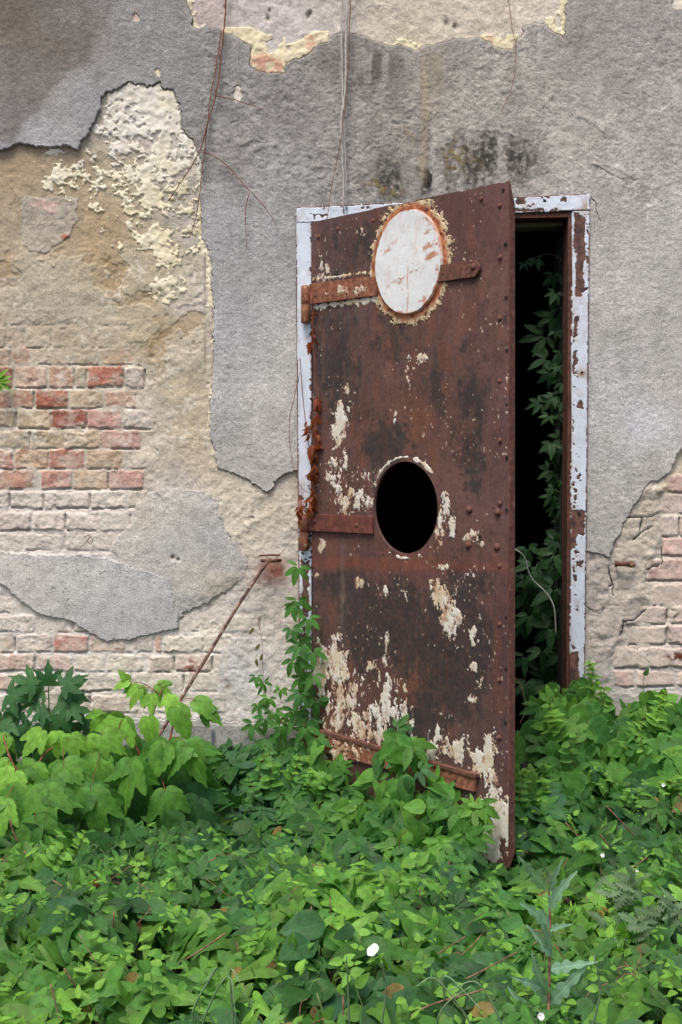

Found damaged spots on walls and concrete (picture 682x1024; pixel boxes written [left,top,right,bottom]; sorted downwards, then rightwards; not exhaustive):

flaking render [187,0,568,74]
flaking render [0,68,455,762]
flaking render [514,194,682,717]
peeling [441,491,478,541]
crack [627,513,663,570]
peeling [429,577,477,647]
crack [587,567,645,636]
peeling [426,724,509,863]